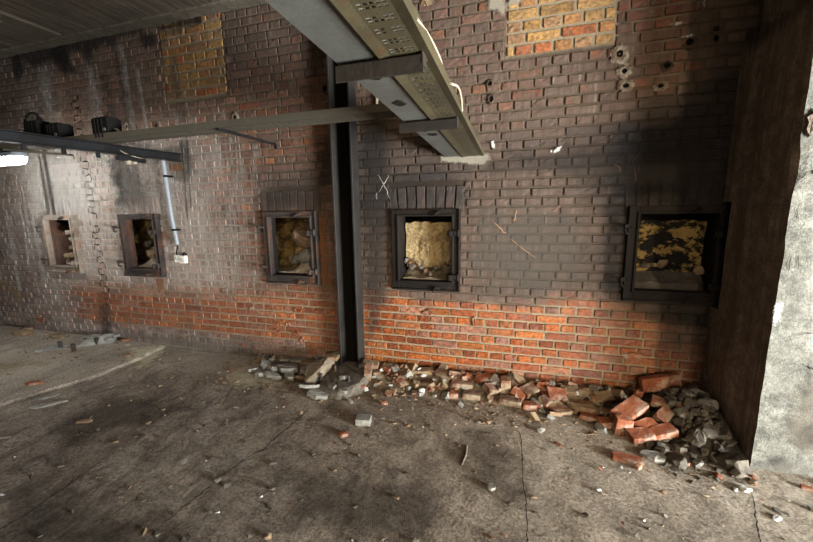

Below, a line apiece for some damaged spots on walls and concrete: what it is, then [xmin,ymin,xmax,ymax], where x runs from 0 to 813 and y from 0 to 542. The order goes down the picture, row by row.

crack [152,410,307,533]
crack [518,429,528,542]